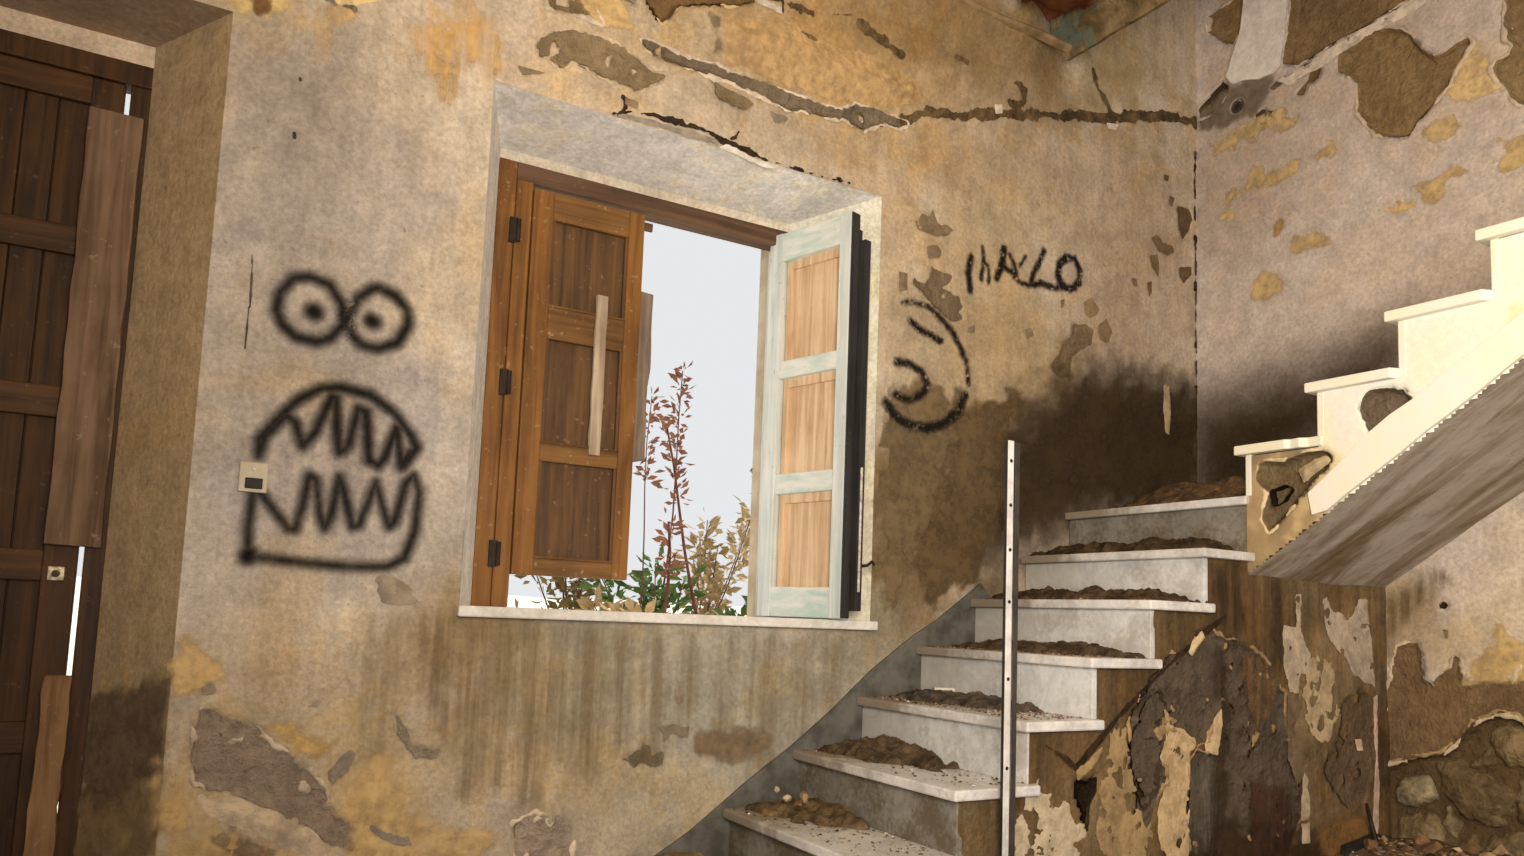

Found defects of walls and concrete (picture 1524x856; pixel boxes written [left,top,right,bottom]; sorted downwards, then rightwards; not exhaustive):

peeling [229,0,288,14]
spalling [518,0,910,133]
crack [612,94,851,184]
crack [772,0,906,60]
crack [954,54,969,65]
crack [899,67,1198,476]
peeling [1274,219,1330,253]
spalling [1196,0,1524,156]
peeling [1378,166,1468,213]
water stain [873,340,1392,607]
spalling [152,637,412,856]
spalling [804,594,1524,856]